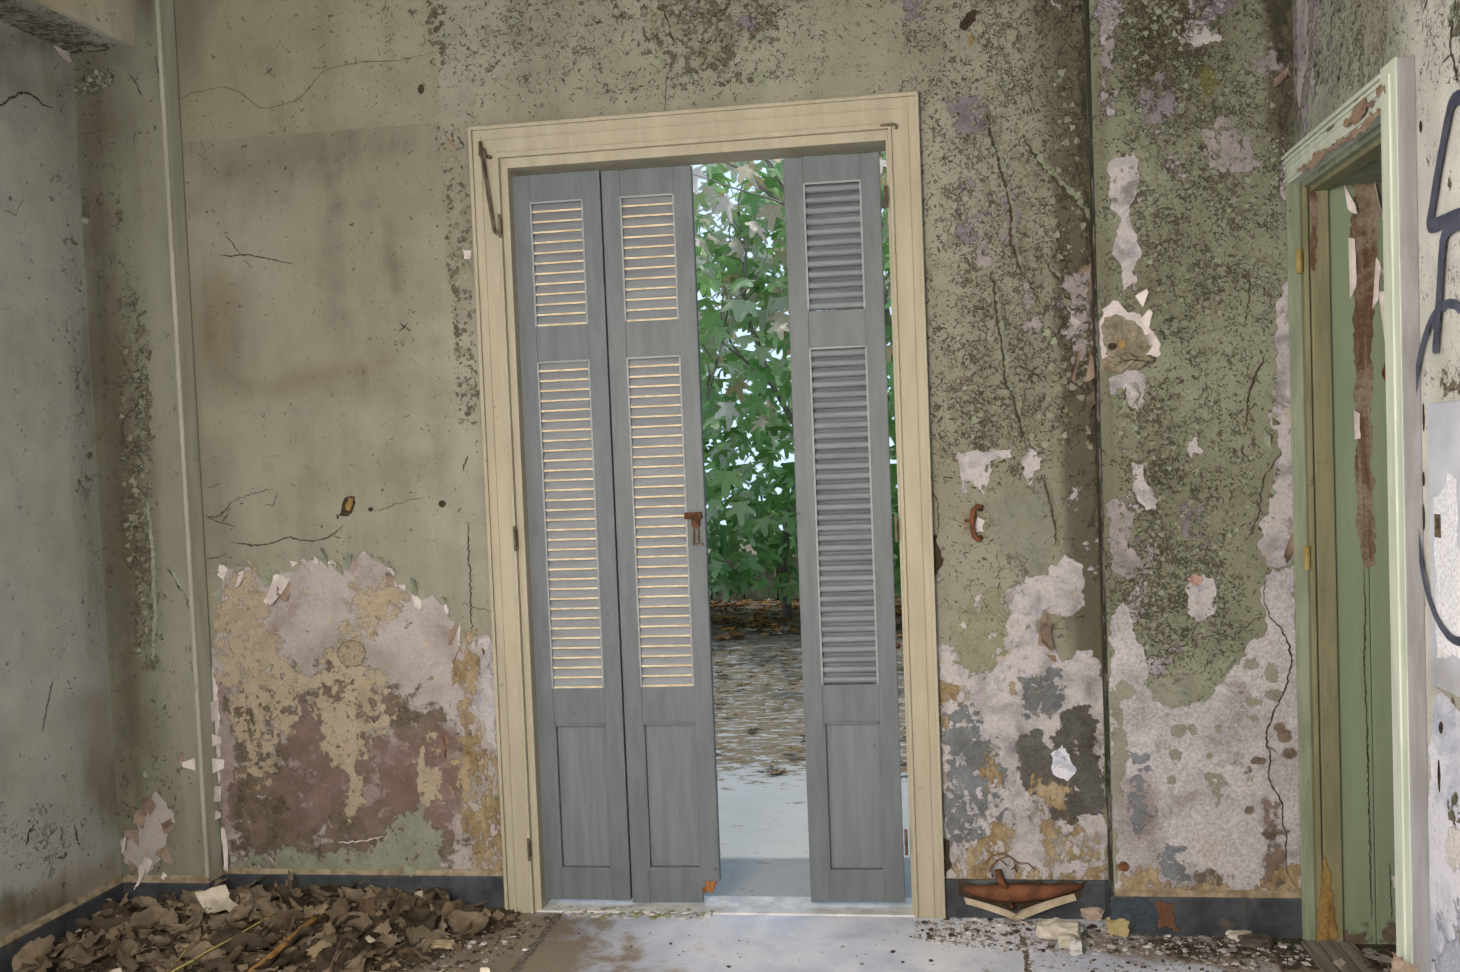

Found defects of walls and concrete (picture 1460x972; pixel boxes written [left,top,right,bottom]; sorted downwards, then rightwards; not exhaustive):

crack [130,53,430,109]
spalling [1448,0,1460,42]
spalling [932,492,944,576]
rust [975,517,984,532]
peeling [937,0,1390,932]
crack [1241,274,1281,541]
peeling [1422,471,1460,660]
spalling [1440,369,1460,397]
peeling [178,548,503,877]
crack [1244,578,1299,890]
peeling [120,771,175,890]
peeling [1390,691,1460,972]